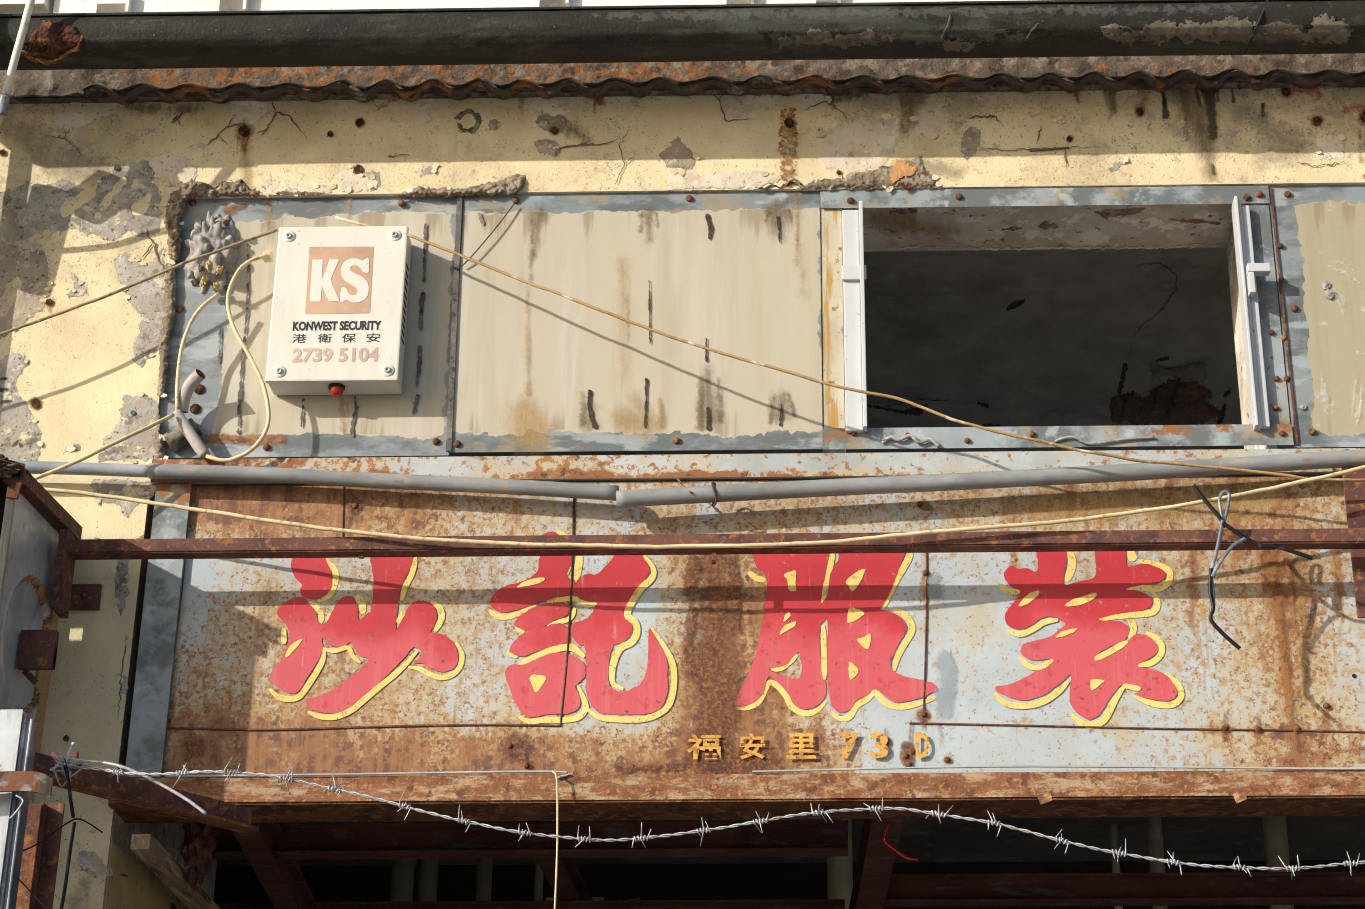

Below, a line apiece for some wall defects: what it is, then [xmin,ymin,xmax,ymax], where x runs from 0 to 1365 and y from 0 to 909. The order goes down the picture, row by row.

corrosion [21,35,83,66]
spalling [396,163,526,198]
peeling [659,137,782,191]
corrosion [777,108,798,187]
peeling [796,98,949,192]
peeling [960,125,984,160]
peeling [0,154,381,518]
peeling [412,224,427,415]
corrosion [1086,488,1269,512]
corrosion [615,554,777,774]
corrosion [1257,550,1305,733]
corrosion [885,708,928,766]